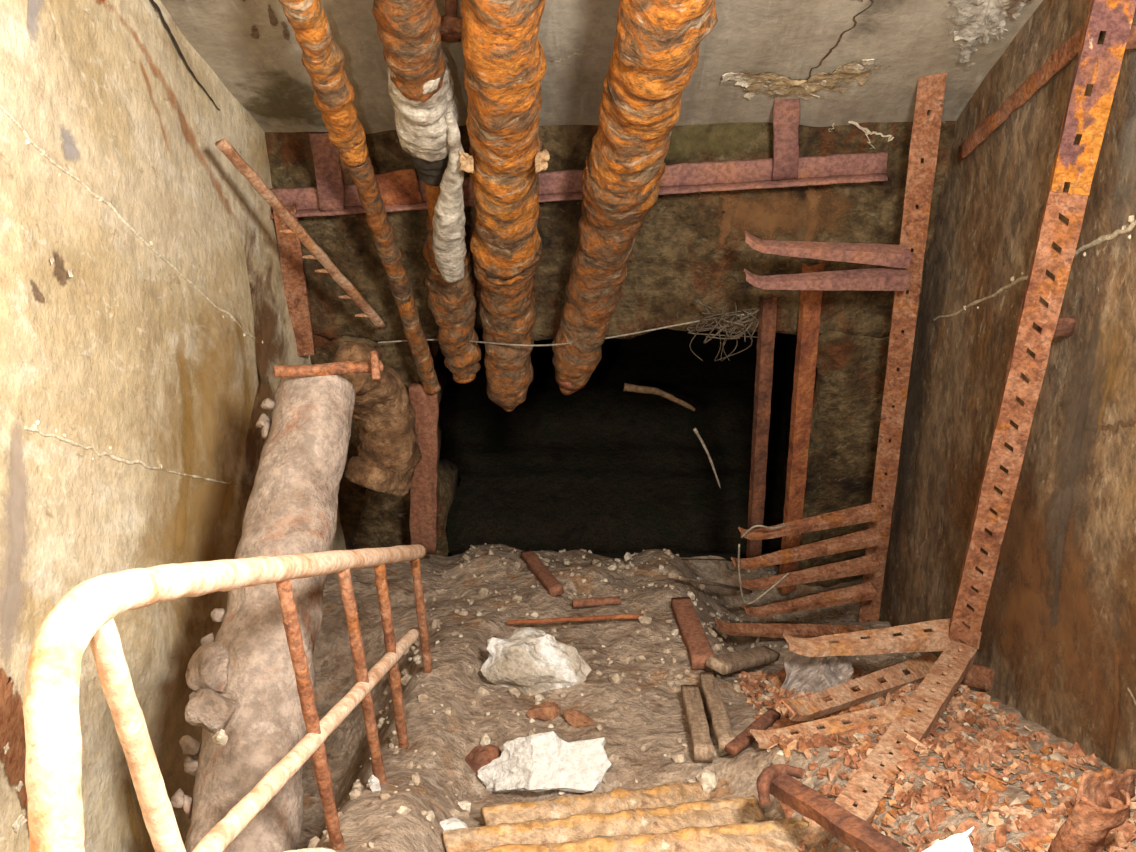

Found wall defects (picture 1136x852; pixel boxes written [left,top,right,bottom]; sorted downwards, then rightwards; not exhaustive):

rust [134,33,205,162]
crack [150,0,220,110]
spalling [721,59,887,100]
crack [806,0,874,80]
spalling [946,0,1029,66]
crack [1097,419,1136,434]